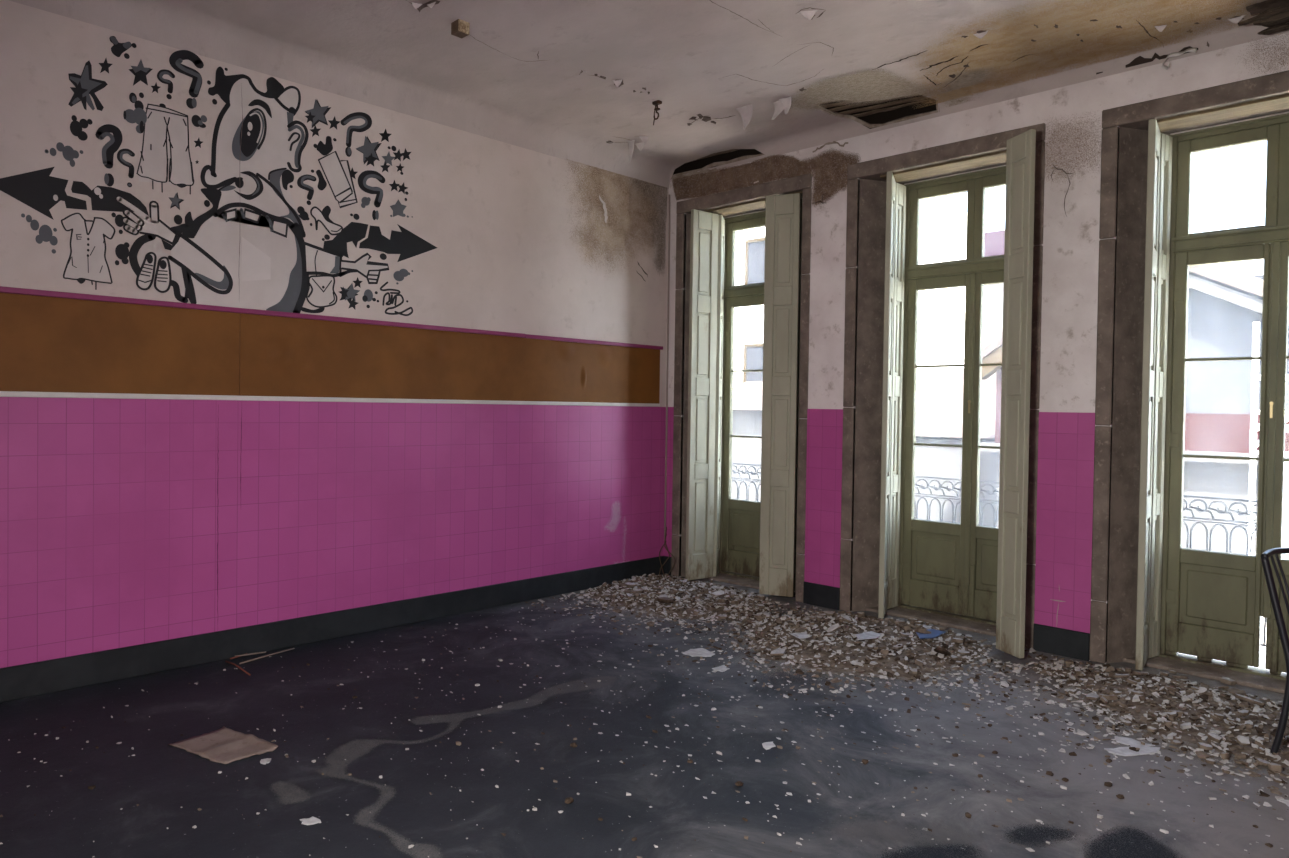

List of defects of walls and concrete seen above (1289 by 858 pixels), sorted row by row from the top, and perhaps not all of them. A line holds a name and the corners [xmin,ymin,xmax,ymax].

crack [710,0,834,86]
leakage [790,0,1262,111]
peeling [687,104,753,130]
peeling [771,87,806,120]
spalling [814,94,940,129]
leakage [804,148,861,207]
leakage [557,159,668,280]